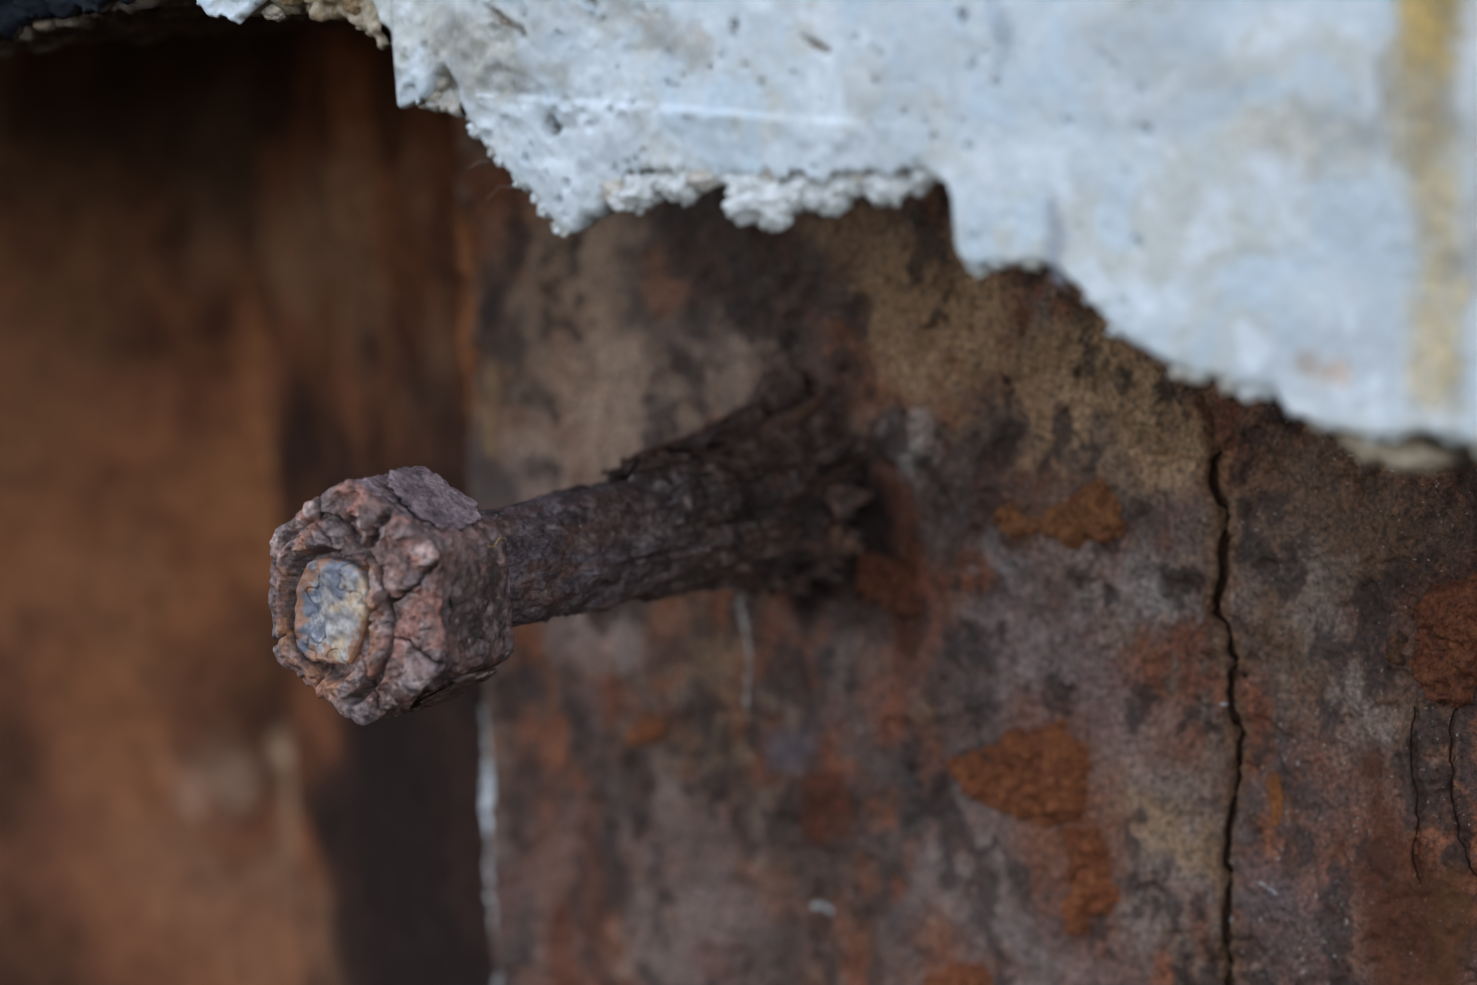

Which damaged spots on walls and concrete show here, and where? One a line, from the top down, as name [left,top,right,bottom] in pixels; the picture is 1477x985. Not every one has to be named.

spalling [600,167,948,233]
spalling [961,258,1042,278]
peeling [600,367,874,562]
rust [791,465,903,615]
rust [979,478,1126,550]
spalling [1169,366,1477,474]
rust [1385,570,1477,709]
crack [1202,446,1248,985]
rust [946,718,1121,936]
crack [1410,706,1477,885]
rust [921,960,993,985]